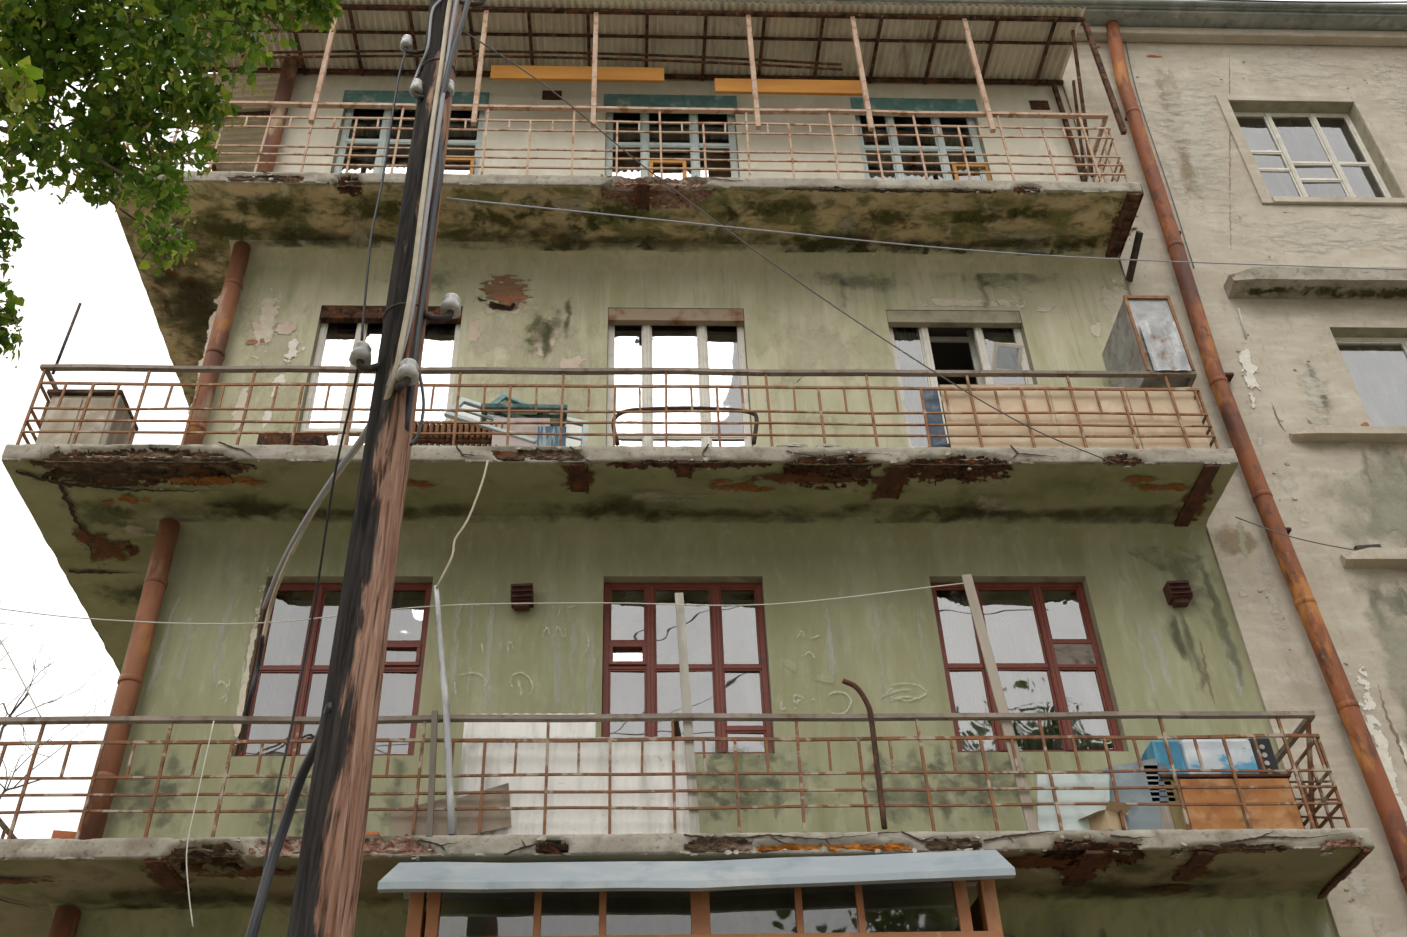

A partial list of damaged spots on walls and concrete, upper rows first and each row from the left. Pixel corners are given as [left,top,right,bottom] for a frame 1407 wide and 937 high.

water stain [283,224,393,248]
water stain [552,225,708,250]
water stain [892,231,1049,252]
peeling [230,286,305,431]
peeling [467,274,587,427]
spalling [25,445,258,491]
spalling [492,445,585,462]
spalling [606,450,882,493]
spalling [906,451,1013,488]
corrosion [1123,476,1213,521]
corrosion [72,528,139,565]
spalling [164,836,302,880]